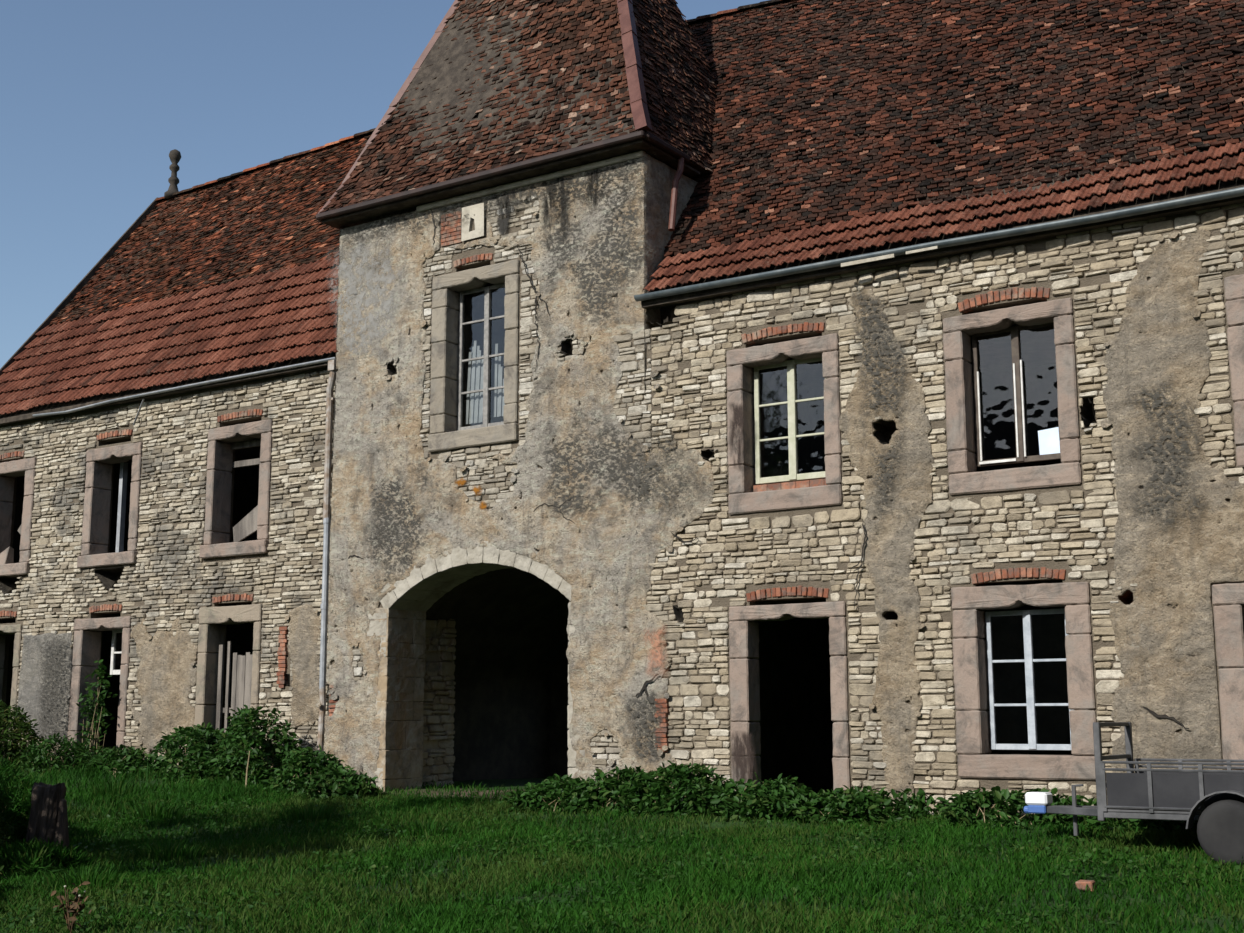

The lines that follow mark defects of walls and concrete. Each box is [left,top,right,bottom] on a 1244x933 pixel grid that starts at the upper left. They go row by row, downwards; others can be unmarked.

spalling [419,195,542,510]
spalling [553,332,591,363]
flaking render [611,304,718,779]
flaking render [839,289,935,795]